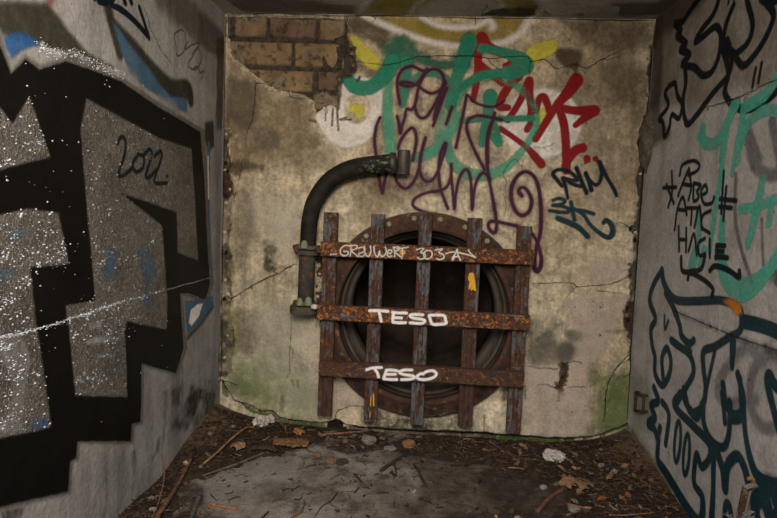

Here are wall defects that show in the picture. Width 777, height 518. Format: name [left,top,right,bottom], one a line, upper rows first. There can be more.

flaking render [227,16,361,131]
spalling [222,133,232,205]
crack [227,264,294,303]
spalling [219,215,316,425]
peeling [326,166,644,442]
crack [543,277,627,292]